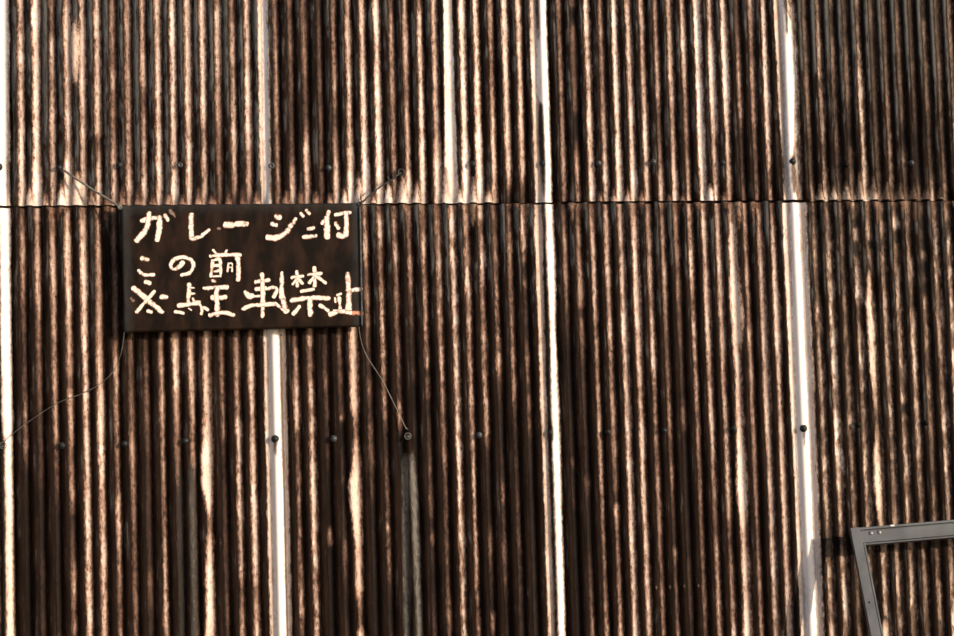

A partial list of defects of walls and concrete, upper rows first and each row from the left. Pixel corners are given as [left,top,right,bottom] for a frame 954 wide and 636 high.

rust [818,217,840,254]
rust [853,201,954,294]